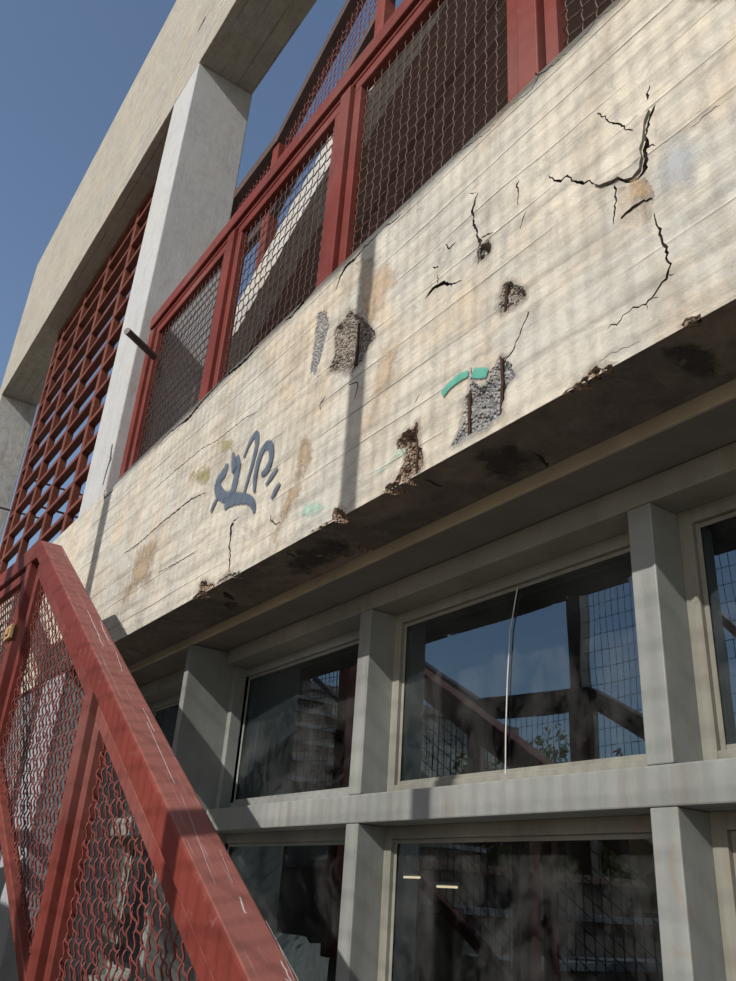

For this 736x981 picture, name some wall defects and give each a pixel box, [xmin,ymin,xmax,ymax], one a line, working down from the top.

crack [425,192,493,299]
crack [549,85,673,361]
spalling [497,281,527,314]
crack [155,347,257,448]
spalling [310,310,376,375]
spalling [451,355,516,446]
spalling [562,364,617,395]
crack [156,412,257,488]
spalling [384,422,424,495]
crack [124,493,205,553]
spalling [192,571,242,599]
crack [223,517,239,600]